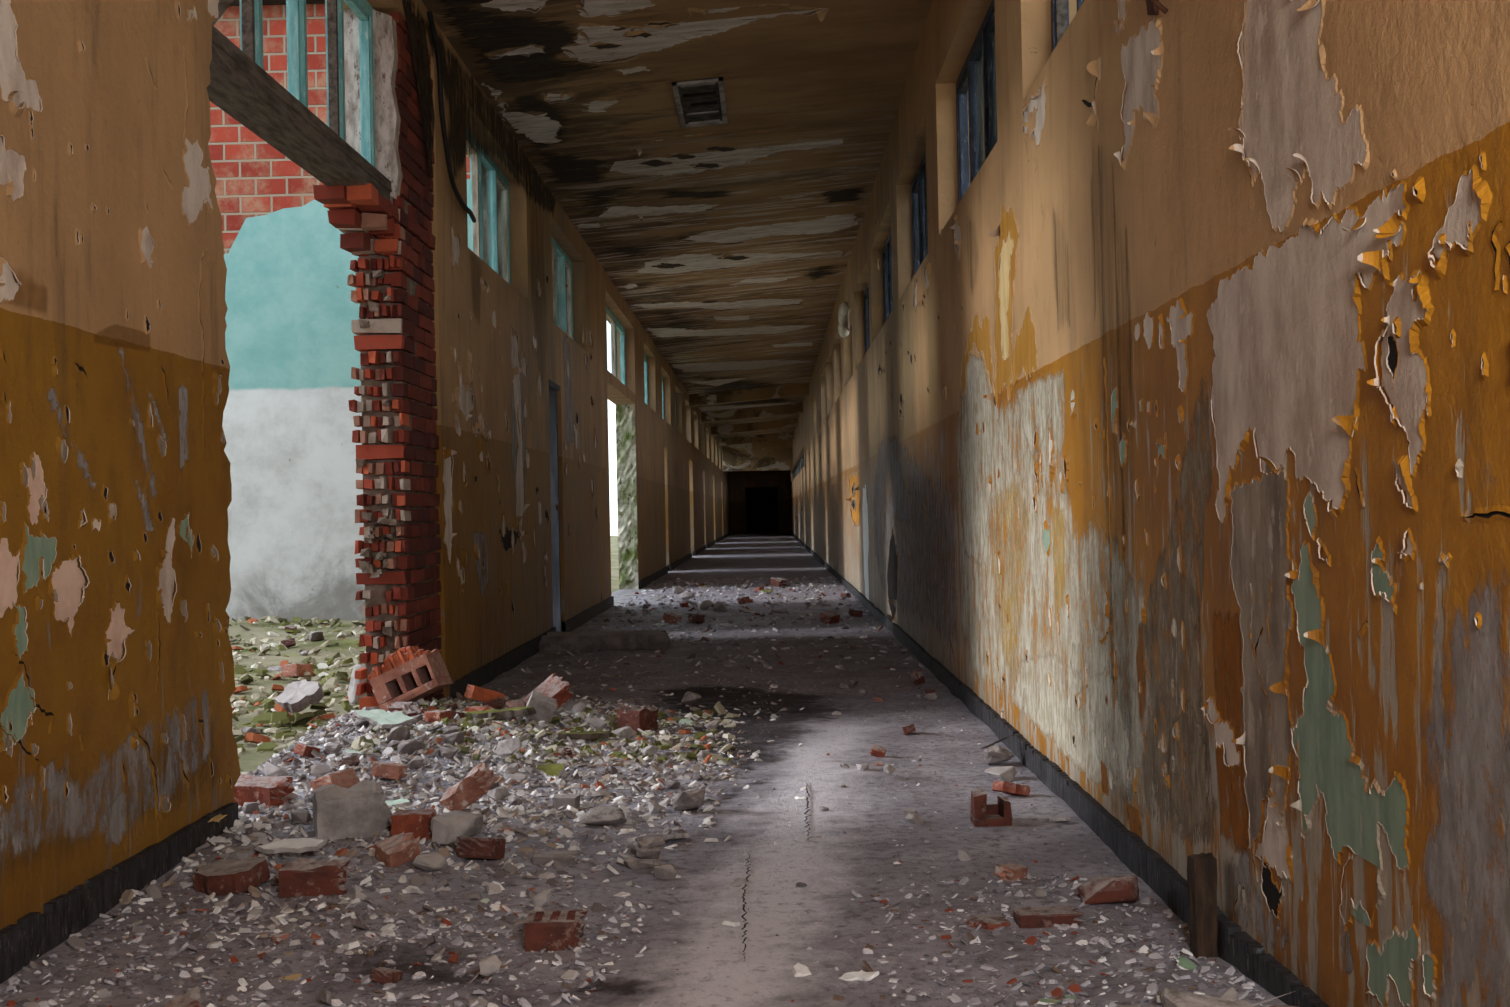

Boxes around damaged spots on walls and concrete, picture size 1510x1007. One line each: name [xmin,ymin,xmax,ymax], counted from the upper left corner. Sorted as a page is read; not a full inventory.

peeling [479,0,829,75]
peeling [0,0,43,203]
damp [403,0,656,259]
peeling [479,82,624,144]
peeling [603,129,845,177]
spalling [313,183,401,256]
peeling [575,203,719,230]
damp [823,187,865,203]
peeling [0,253,22,303]
peeling [617,212,877,386]
peeling [441,277,571,599]
peeling [902,0,1510,1007]